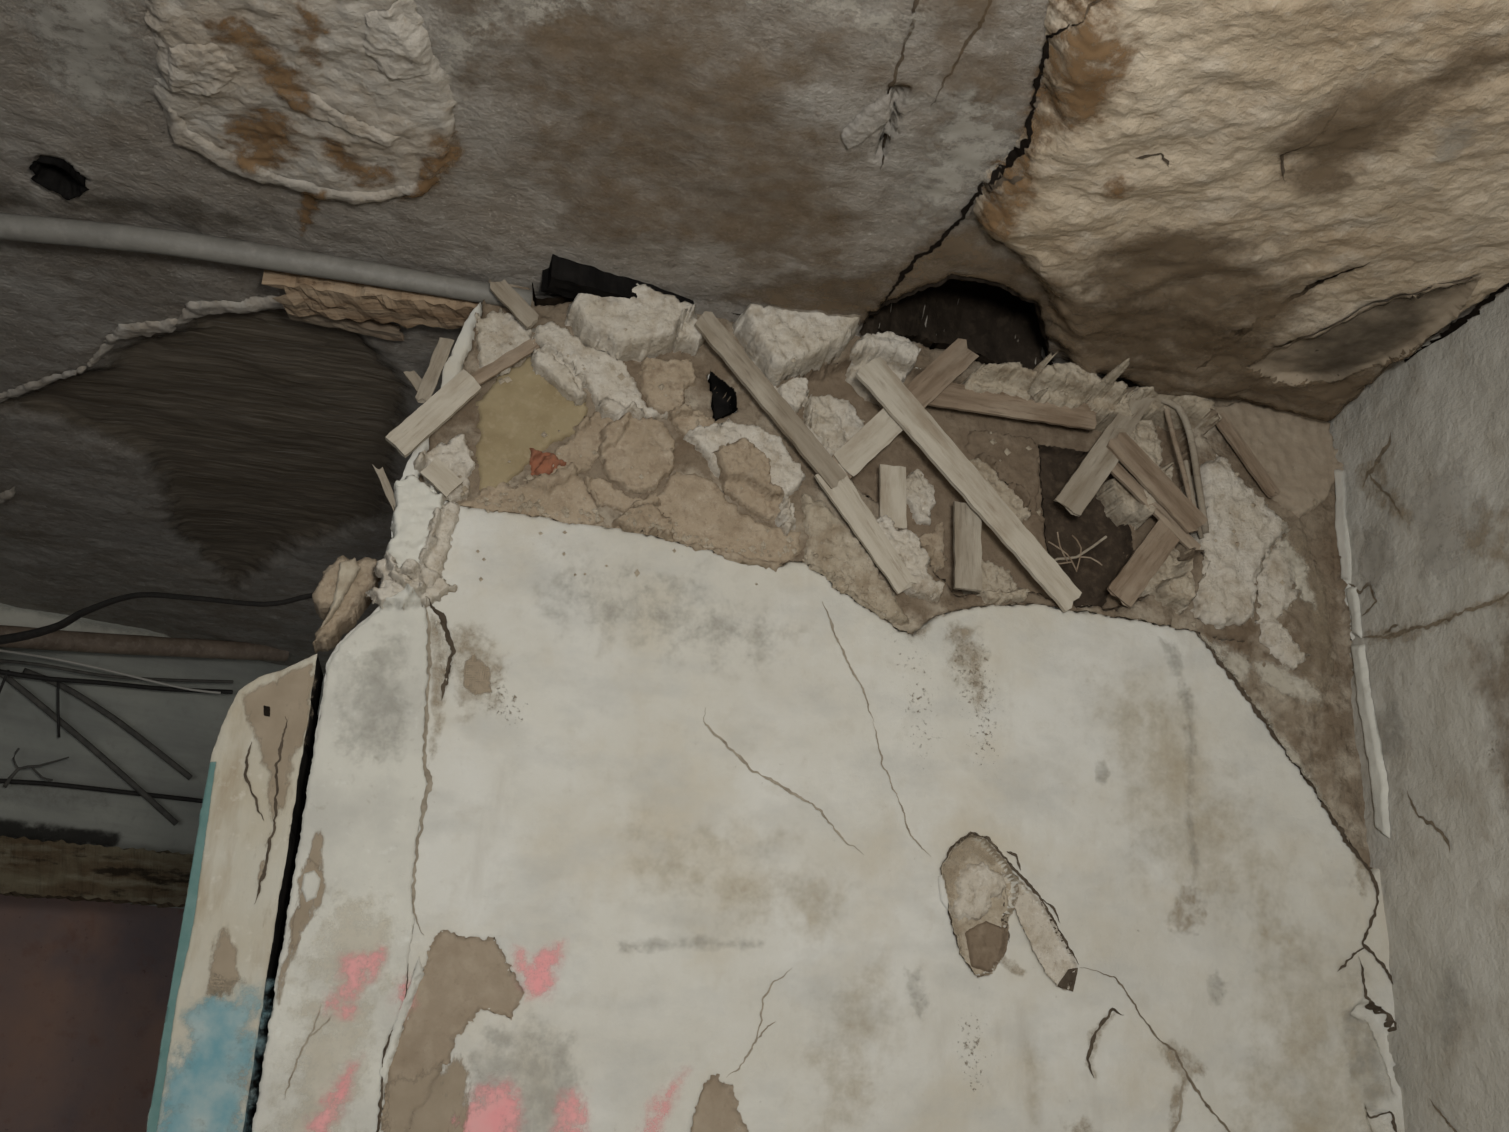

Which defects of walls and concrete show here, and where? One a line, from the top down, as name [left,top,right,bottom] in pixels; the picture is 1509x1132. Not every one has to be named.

peeling [22,0,457,205]
water stain [440,0,840,245]
water stain [794,0,926,41]
crack [883,0,1102,304]
water stain [1285,46,1509,193]
water stain [730,227,1420,421]
peeling [384,283,1053,625]
peeling [732,274,1344,709]
crack [376,596,456,1132]
spalling [938,831,1078,992]
crack [1153,624,1397,1032]
crack [1086,968,1230,1132]